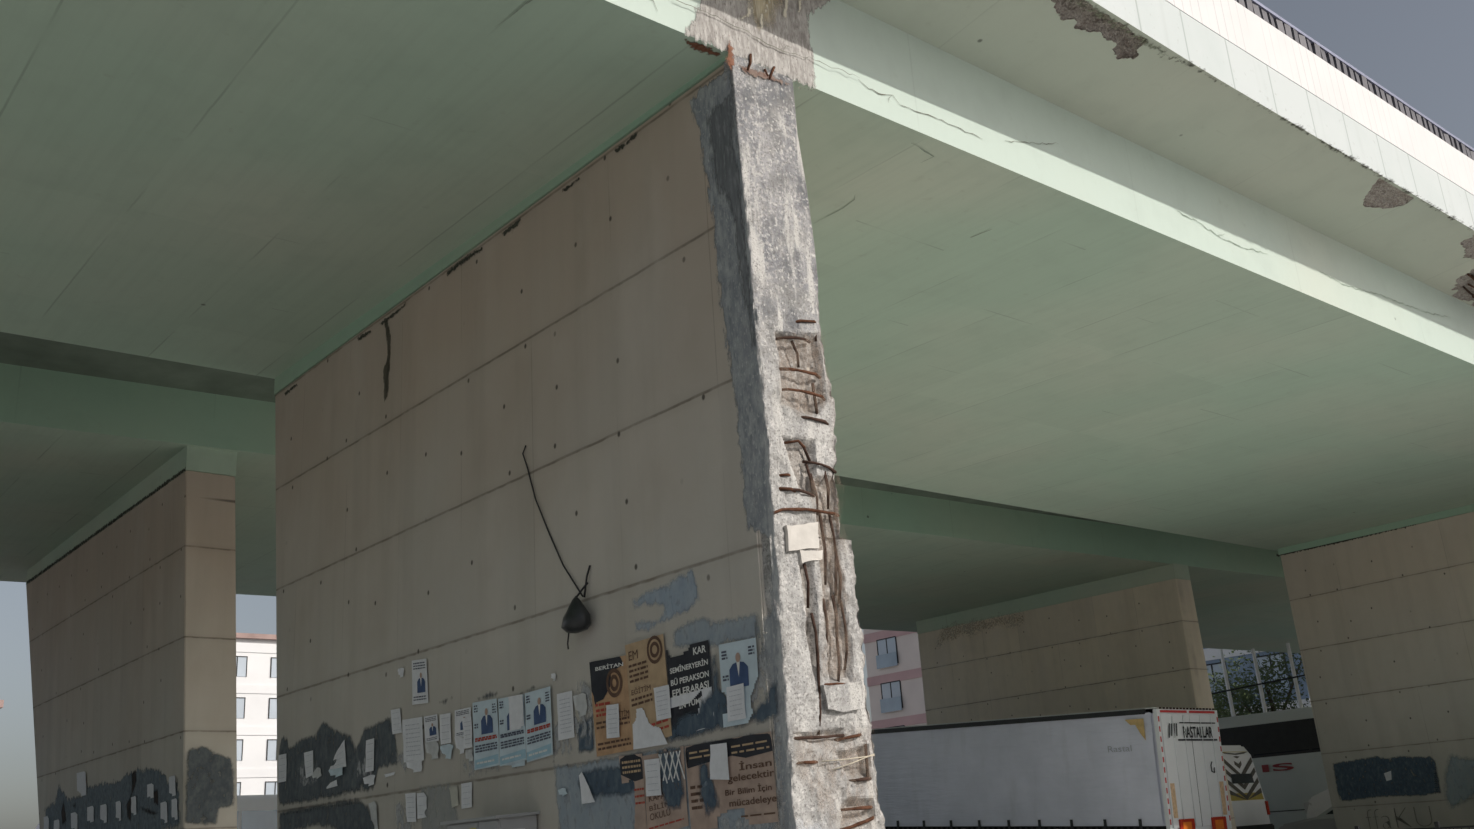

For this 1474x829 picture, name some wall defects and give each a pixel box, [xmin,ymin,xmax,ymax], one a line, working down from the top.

spalling [1051,0,1148,59]
crack [652,0,1054,163]
spalling [1363,178,1414,209]
spalling [1451,235,1474,306]
spalling [685,0,885,829]